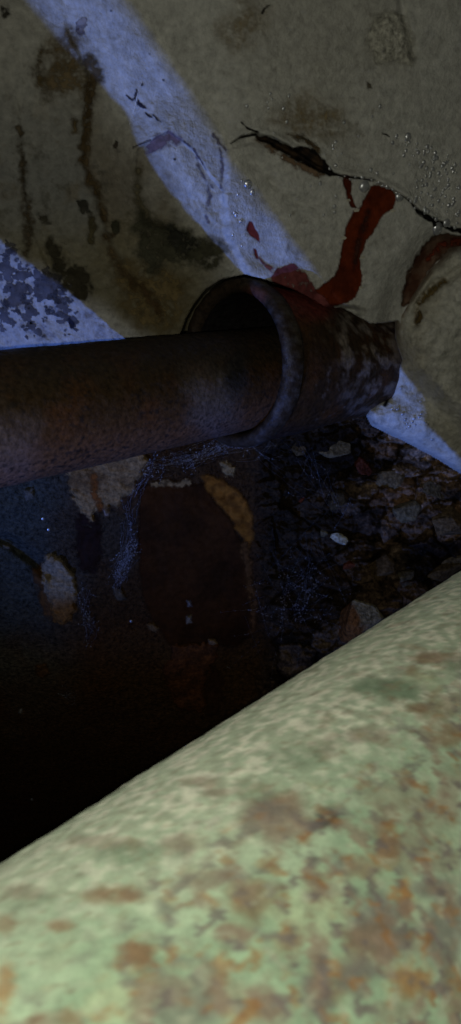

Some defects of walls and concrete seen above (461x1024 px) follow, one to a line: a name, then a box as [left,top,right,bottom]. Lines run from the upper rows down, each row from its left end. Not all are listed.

damp [35,27,225,274]
crack [231,122,370,181]
damp [15,125,50,257]
crack [401,195,461,233]
peeling [0,239,79,340]
damp [46,238,93,300]
rust [259,257,334,308]
peeling [33,554,78,625]